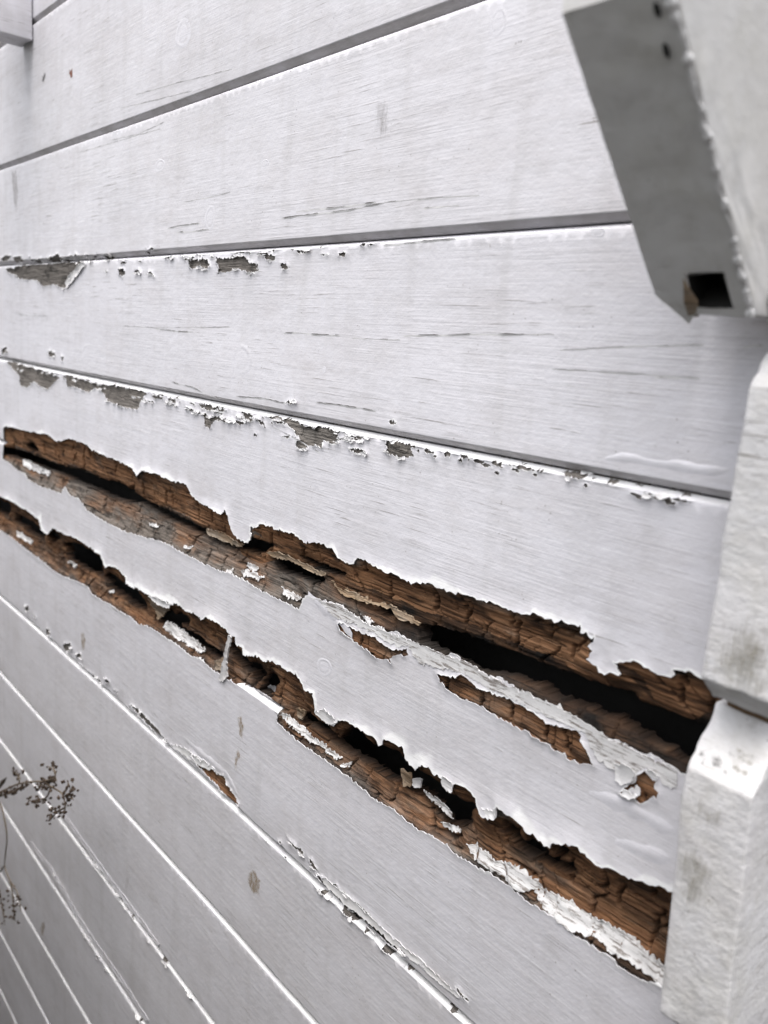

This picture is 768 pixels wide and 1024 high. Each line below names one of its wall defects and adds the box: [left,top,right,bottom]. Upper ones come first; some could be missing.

peeling [0,243,345,290]
peeling [23,459,51,477]
peeling [382,436,552,476]
peeling [564,467,701,505]
peeling [226,562,265,582]
peeling [281,586,302,601]
peeling [148,595,206,654]
peeling [314,708,335,725]
peeling [129,705,238,807]
peeling [279,841,469,1013]